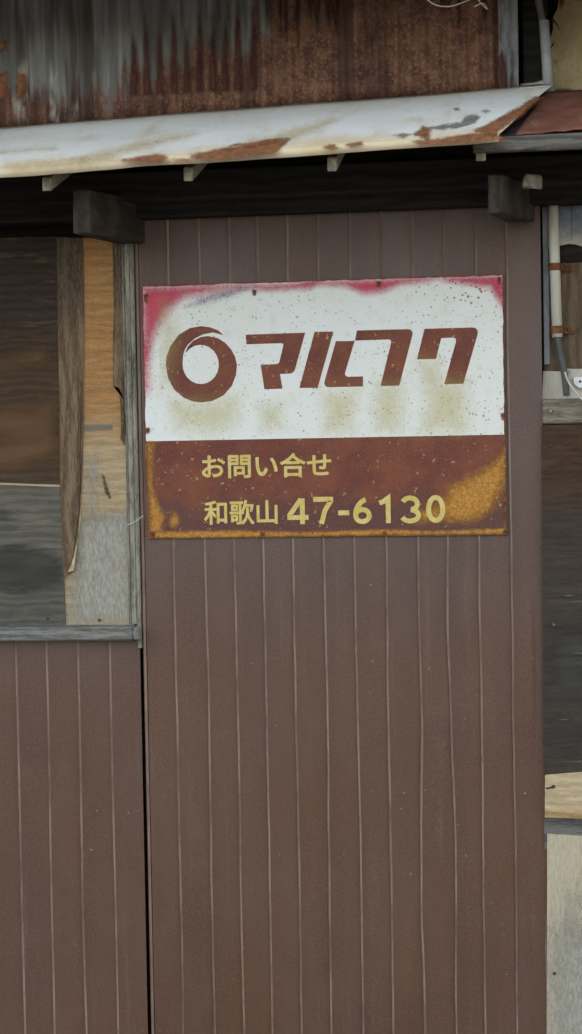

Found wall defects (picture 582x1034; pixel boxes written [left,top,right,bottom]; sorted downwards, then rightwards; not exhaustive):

rust [131,9,257,95]